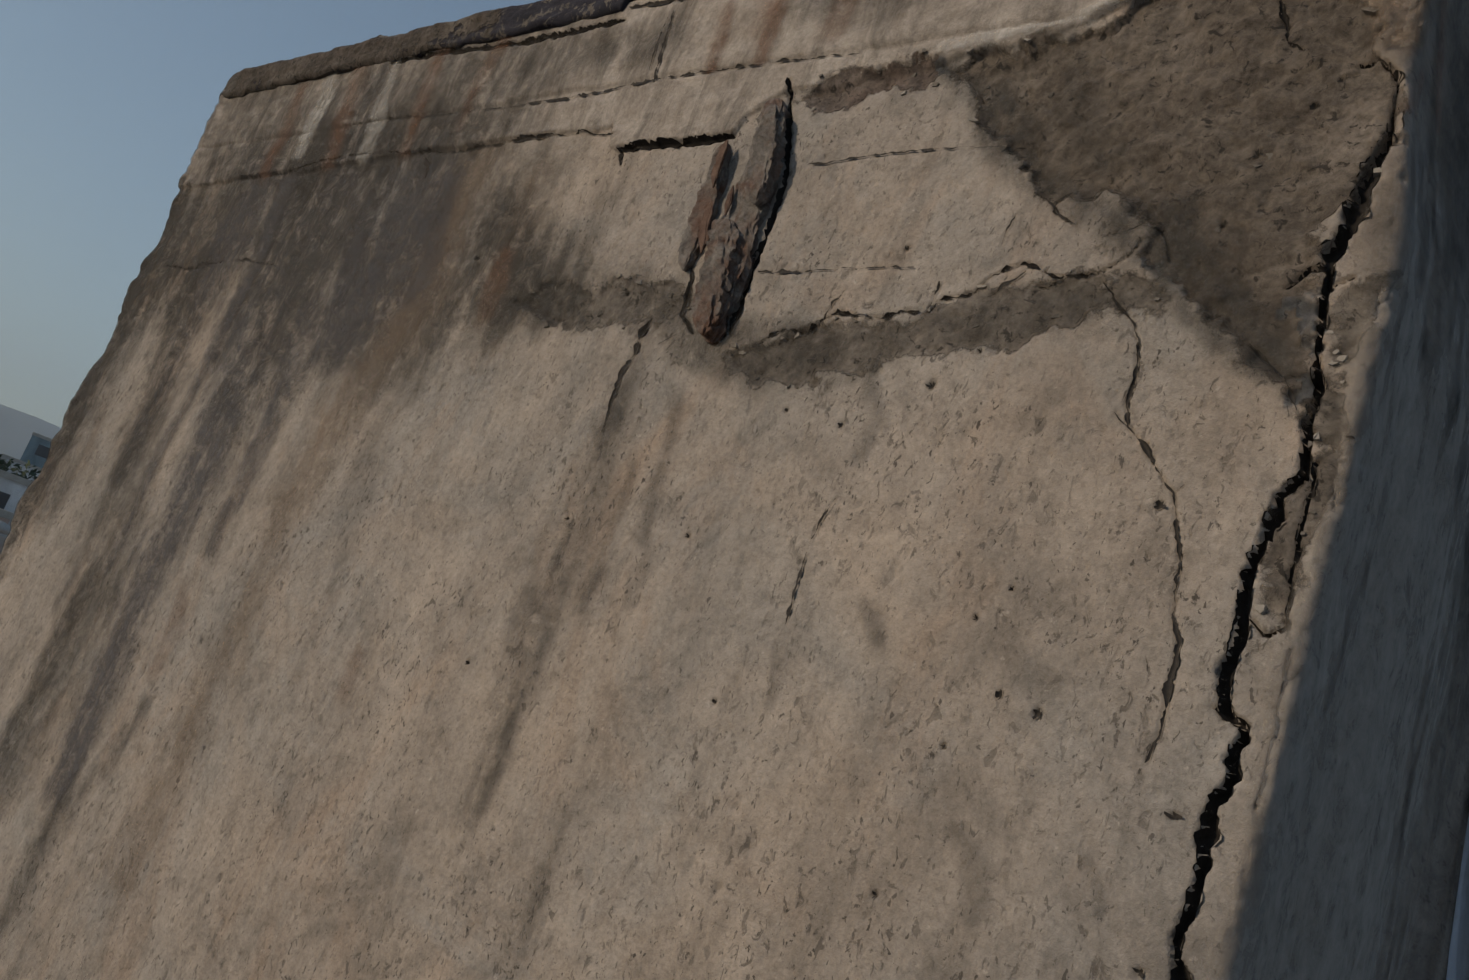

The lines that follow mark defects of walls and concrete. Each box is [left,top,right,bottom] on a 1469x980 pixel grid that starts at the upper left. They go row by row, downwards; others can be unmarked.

water stain [0,88,585,847]
crack [239,0,1185,763]
spalling [719,0,1426,622]
crack [1170,58,1405,980]
crack [1279,0,1303,51]